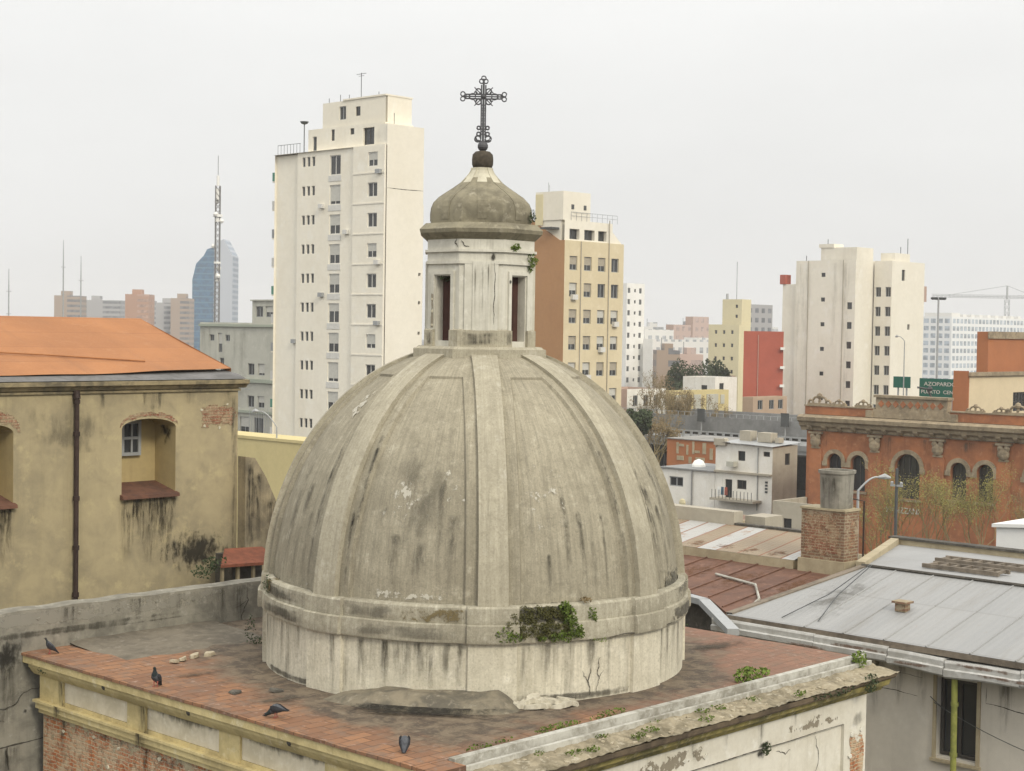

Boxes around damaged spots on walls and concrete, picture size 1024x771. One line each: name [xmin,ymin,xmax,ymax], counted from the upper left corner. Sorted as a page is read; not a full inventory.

spalling [200,403,238,429]
leakage [124,497,175,530]
peeling [383,482,419,519]
crack [582,632,635,691]
spalling [848,727,864,771]